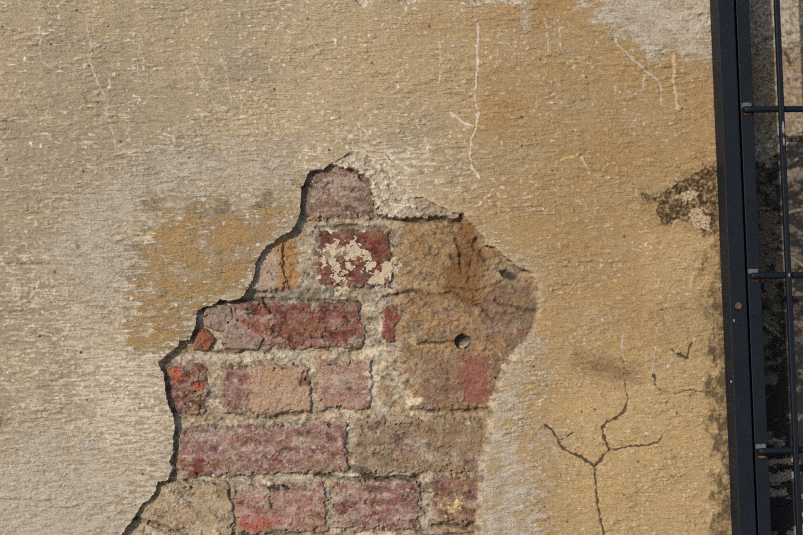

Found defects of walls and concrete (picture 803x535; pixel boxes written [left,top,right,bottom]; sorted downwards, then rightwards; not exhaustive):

peeling [573,0,712,62]
spalling [640,160,719,238]
spalling [122,151,540,535]
crack [544,335,662,535]